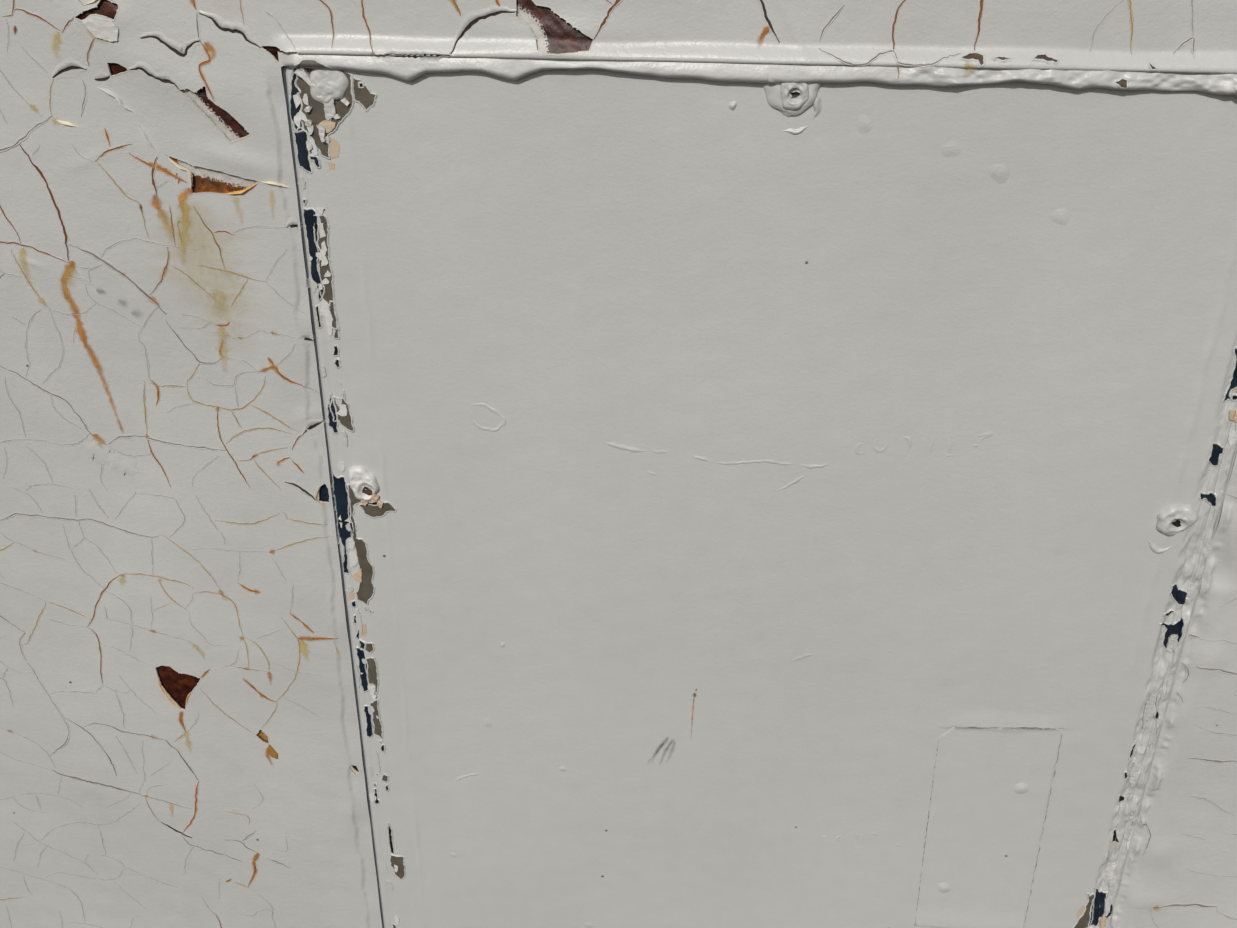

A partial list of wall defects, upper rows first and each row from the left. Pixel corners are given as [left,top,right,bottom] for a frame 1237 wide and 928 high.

crack [319,0,374,54]
peeling [375,0,594,68]
crack [593,0,623,40]
crack [757,0,781,43]
crack [1090,0,1134,55]
peeling [0,0,378,246]
peeling [302,198,342,369]
crack [0,46,343,928]
peeling [315,462,398,805]
peeling [1159,583,1188,653]
peeling [100,642,322,759]
crack [1176,634,1237,764]